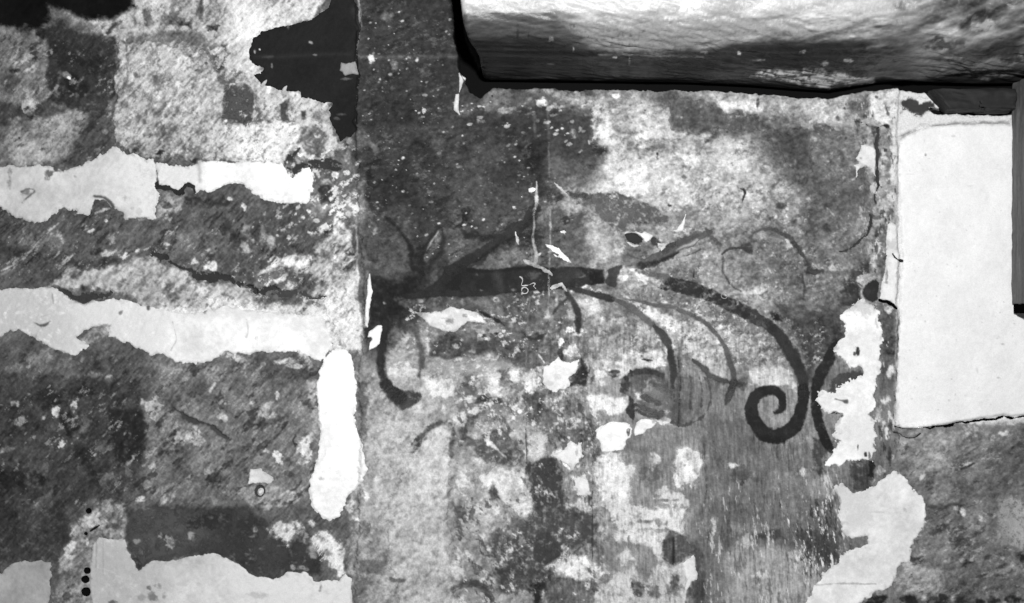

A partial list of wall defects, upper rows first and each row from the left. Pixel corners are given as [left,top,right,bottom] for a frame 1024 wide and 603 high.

peeling [249,0,361,142]
flaking render [0,146,342,224]
crack [150,250,327,299]
flaking render [0,215,382,603]
flaking render [542,357,579,392]
flaking render [815,222,900,467]
flaking render [527,419,689,536]
flaking render [806,471,926,603]